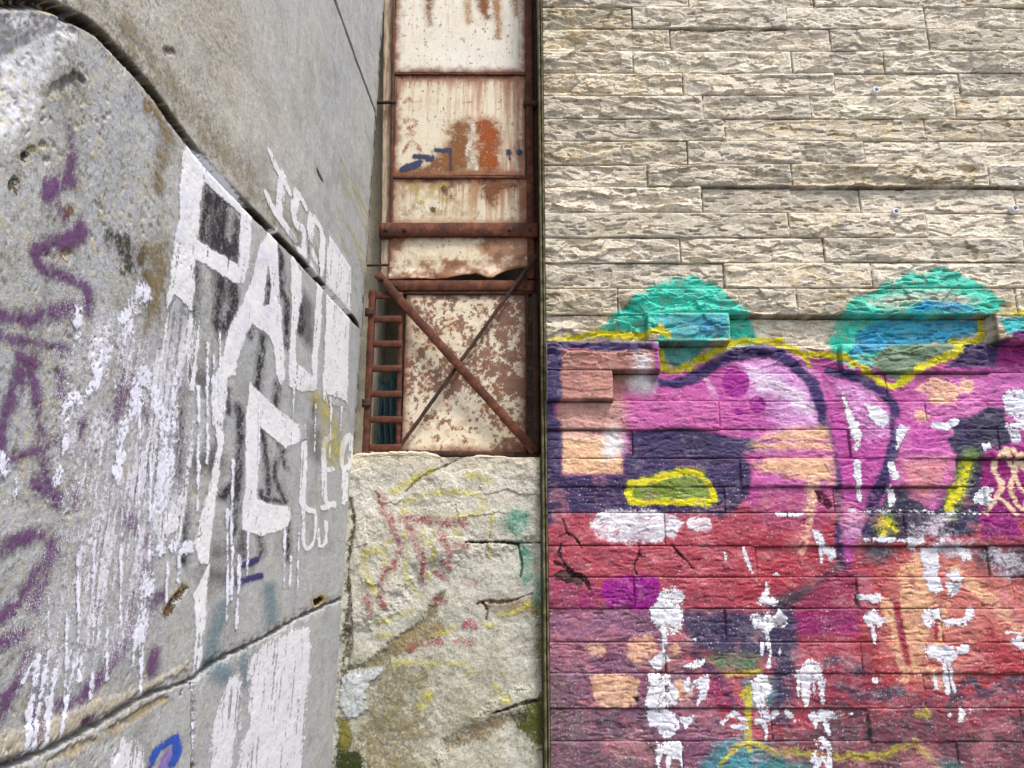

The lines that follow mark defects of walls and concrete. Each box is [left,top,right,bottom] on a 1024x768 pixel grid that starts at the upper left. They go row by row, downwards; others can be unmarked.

rust [465,0,518,39]
rust [397,117,520,204]
crack [465,520,591,590]
crack [673,546,701,569]